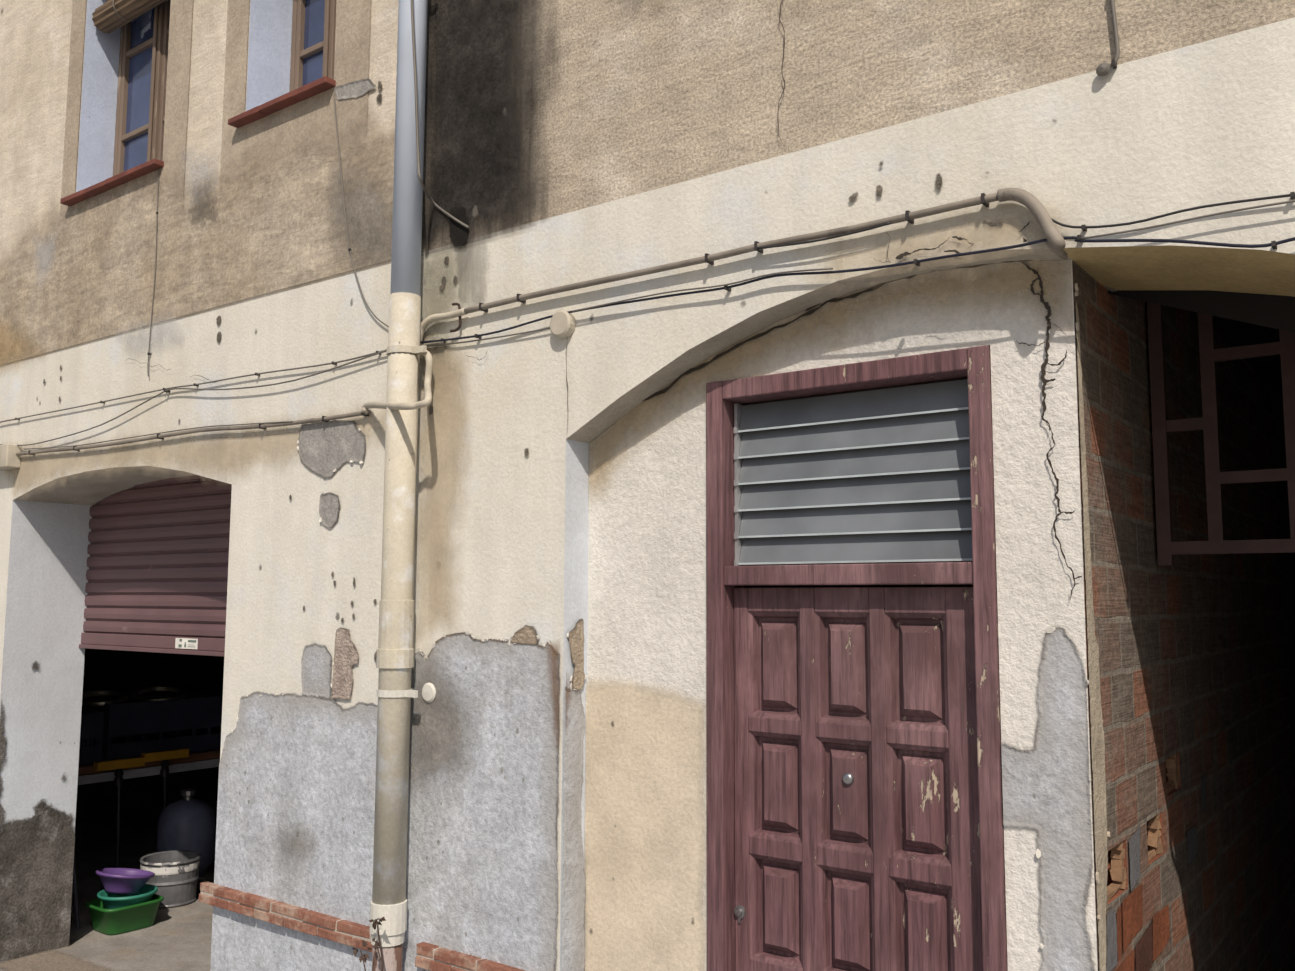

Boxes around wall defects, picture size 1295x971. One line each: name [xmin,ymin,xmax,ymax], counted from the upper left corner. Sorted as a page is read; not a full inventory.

damp [421,0,540,315]
spalling [33,799,45,817]
peeling [210,906,372,971]
peeling [214,578,378,926]
spalling [297,420,366,528]
peeling [402,619,586,971]
crack [643,221,1082,599]
peeling [1001,283,1170,971]